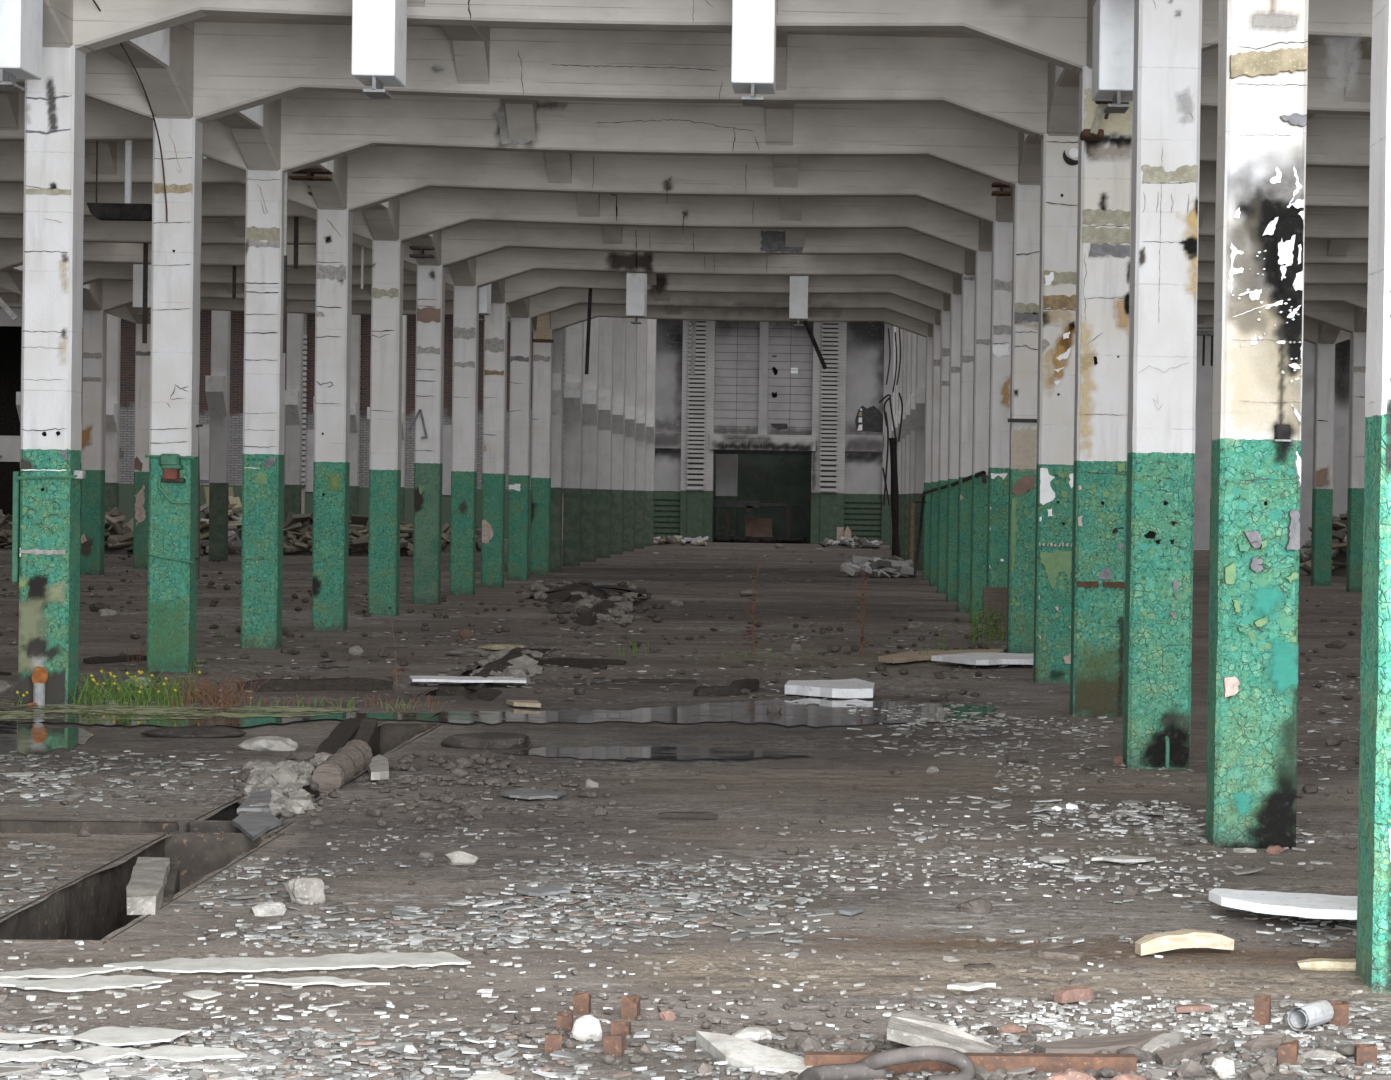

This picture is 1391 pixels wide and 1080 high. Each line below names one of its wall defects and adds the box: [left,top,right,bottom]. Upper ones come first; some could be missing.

damp [608,252,667,294]
peeling [1228,162,1304,383]
corrosion [1046,311,1094,444]
peeling [20,494,87,574]
peeling [989,463,1193,664]
peeling [1221,451,1301,712]